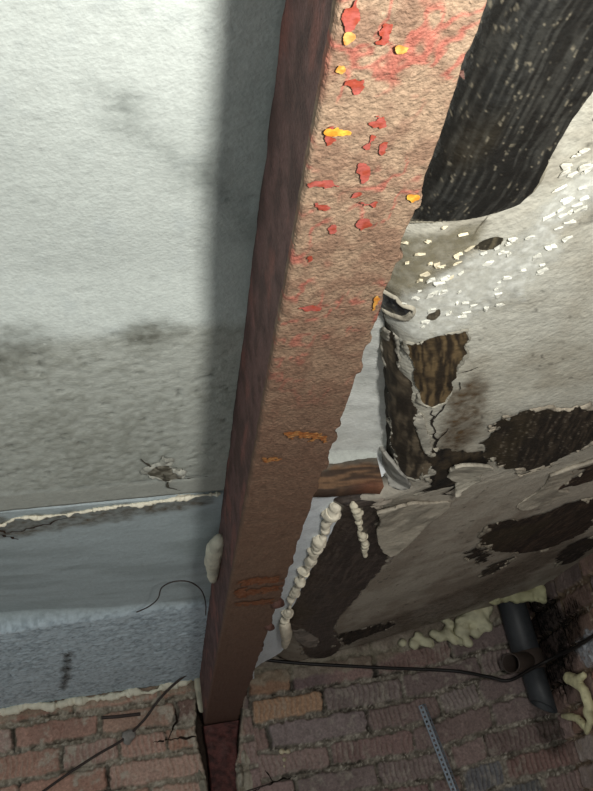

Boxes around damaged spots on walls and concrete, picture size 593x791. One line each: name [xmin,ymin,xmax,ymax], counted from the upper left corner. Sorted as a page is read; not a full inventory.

spalling [409,0,593,230]
water stain [385,229,478,297]
crack [430,404,449,448]
spalling [290,148,593,658]
spalling [140,456,187,483]
crack [0,518,66,539]